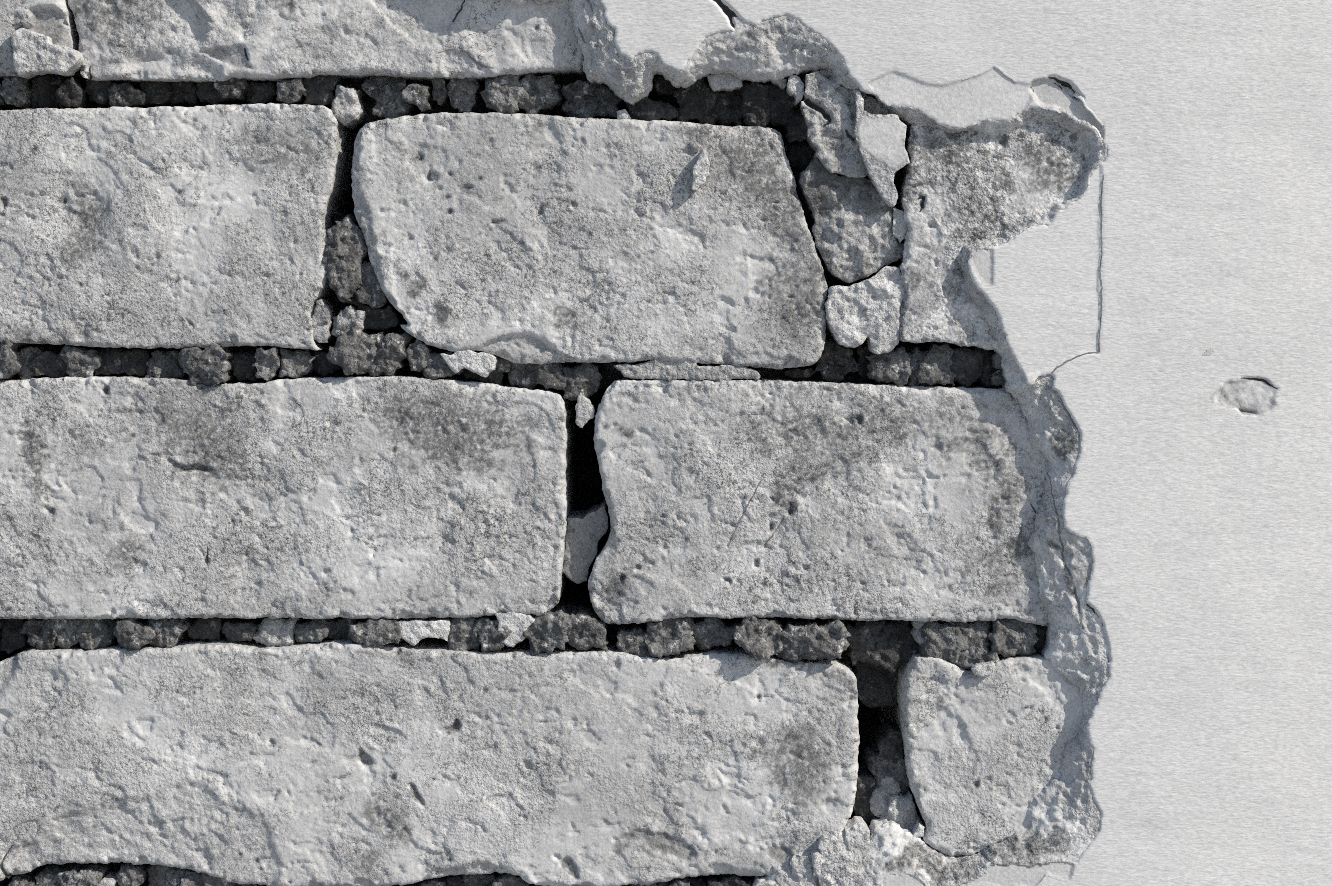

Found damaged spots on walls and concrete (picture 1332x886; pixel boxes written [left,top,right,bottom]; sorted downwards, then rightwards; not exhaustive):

crack [714,0,737,28]
peeling [867,64,1104,138]
crack [1048,77,1078,99]
peeling [691,150,710,191]
crack [1052,175,1104,438]
spalling [487,338,565,363]
peeling [575,393,595,428]
flaking render [1211,377,1278,415]
peeling [358,750,372,766]
spalling [7,781,279,885]
spalling [616,829,696,861]
peeling [960,862,1074,886]